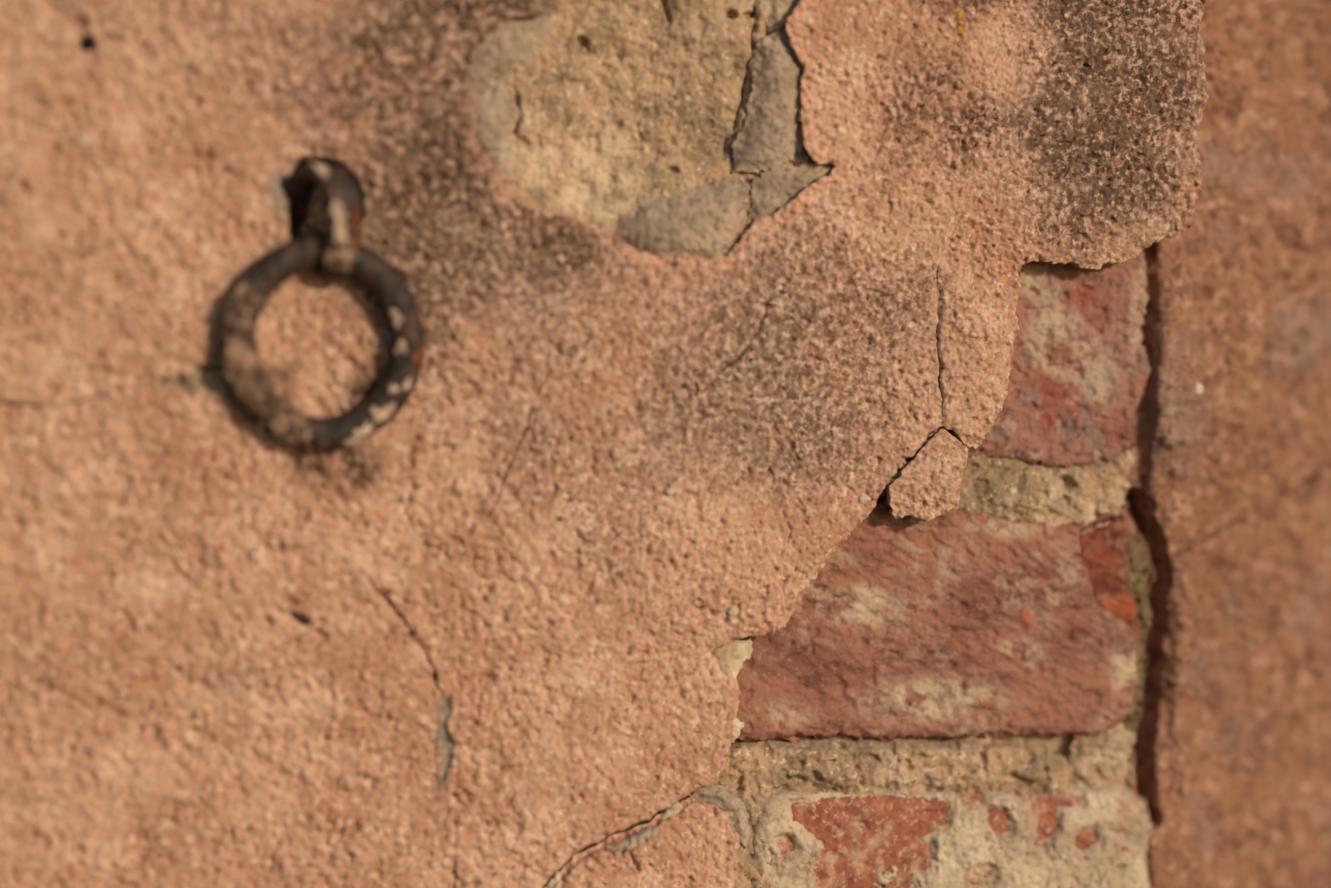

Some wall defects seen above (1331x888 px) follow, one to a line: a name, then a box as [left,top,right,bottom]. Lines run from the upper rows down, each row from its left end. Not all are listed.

flaking render [466,0,836,260]
corrosion [348,195,361,253]
flaking render [695,251,1152,888]
crack [368,578,443,694]
crack [543,790,697,888]